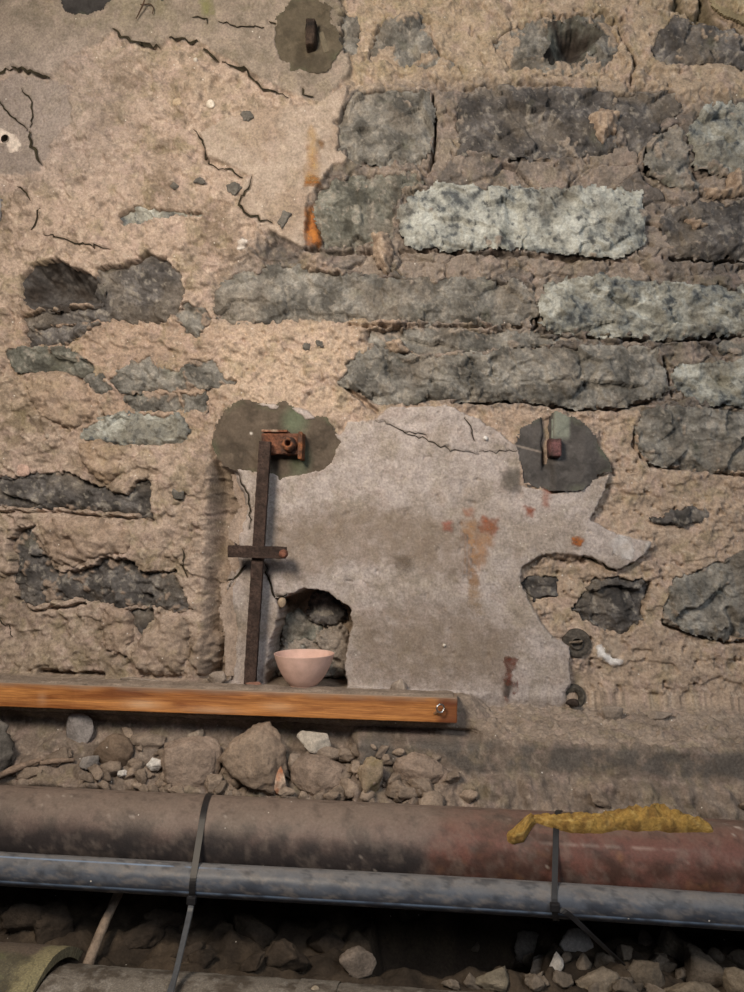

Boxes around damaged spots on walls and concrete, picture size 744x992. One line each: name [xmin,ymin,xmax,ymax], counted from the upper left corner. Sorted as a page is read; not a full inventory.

crack [112,16,313,98]
crack [0,66,50,165]
crack [17,186,111,250]
crack [193,129,272,223]
corrosion [306,207,320,245]
flaking render [312,14,744,263]
flaking render [5,256,744,492]
flaking render [212,398,341,545]
flaking render [13,527,193,635]
flaking render [279,589,349,679]
corrosion [504,657,516,698]
flaking render [571,576,649,634]